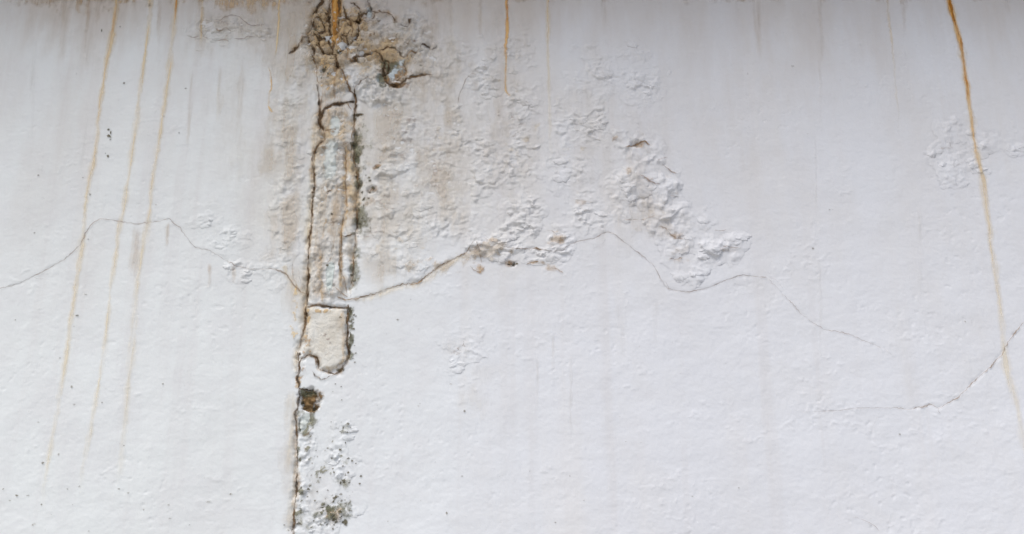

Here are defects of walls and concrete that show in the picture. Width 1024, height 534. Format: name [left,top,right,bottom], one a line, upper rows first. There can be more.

corrosion [332,0,341,42]
flaking render [294,0,439,110]
corrosion [948,0,962,52]
leakage [323,116,340,178]
leakage [351,134,380,235]
crack [33,0,748,534]
leakage [335,307,356,400]
crack [894,323,1023,413]
flaking render [291,389,367,534]